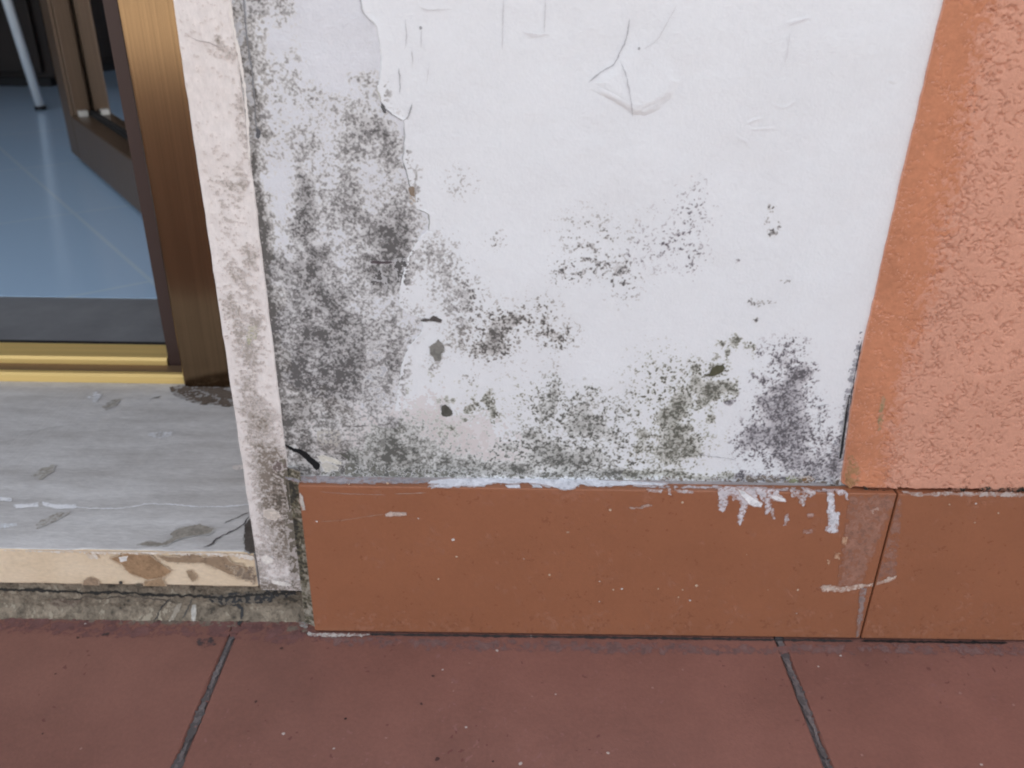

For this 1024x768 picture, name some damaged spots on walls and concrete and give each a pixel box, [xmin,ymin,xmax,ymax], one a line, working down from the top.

crack [589,5,677,117]
peeling [228,0,445,411]
mould [764,204,782,237]
mould [747,297,777,323]